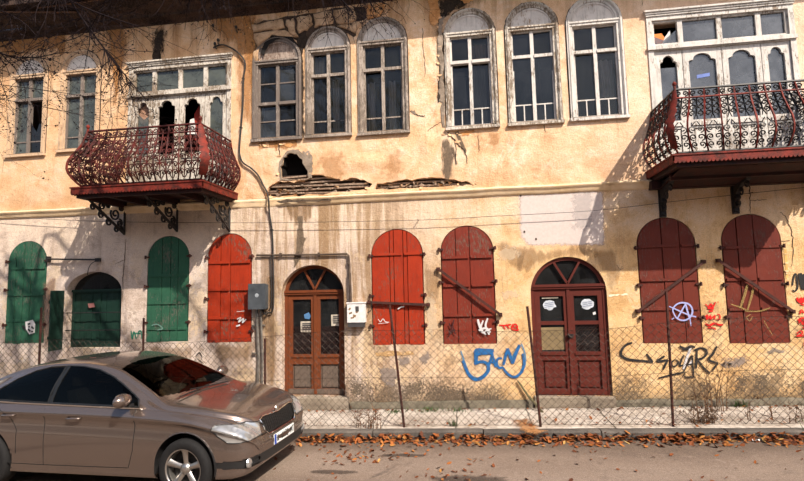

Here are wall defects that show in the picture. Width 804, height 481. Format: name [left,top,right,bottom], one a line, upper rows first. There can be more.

spalling [428,0,475,143]
spalling [276,142,313,181]
crack [749,186,794,266]